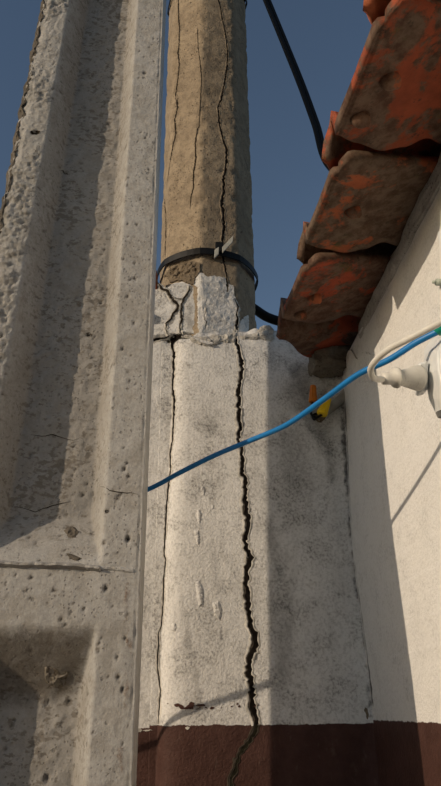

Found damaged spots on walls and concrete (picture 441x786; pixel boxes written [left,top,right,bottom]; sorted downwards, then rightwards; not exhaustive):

crack [153,283,207,724]
crack [164,0,262,786]